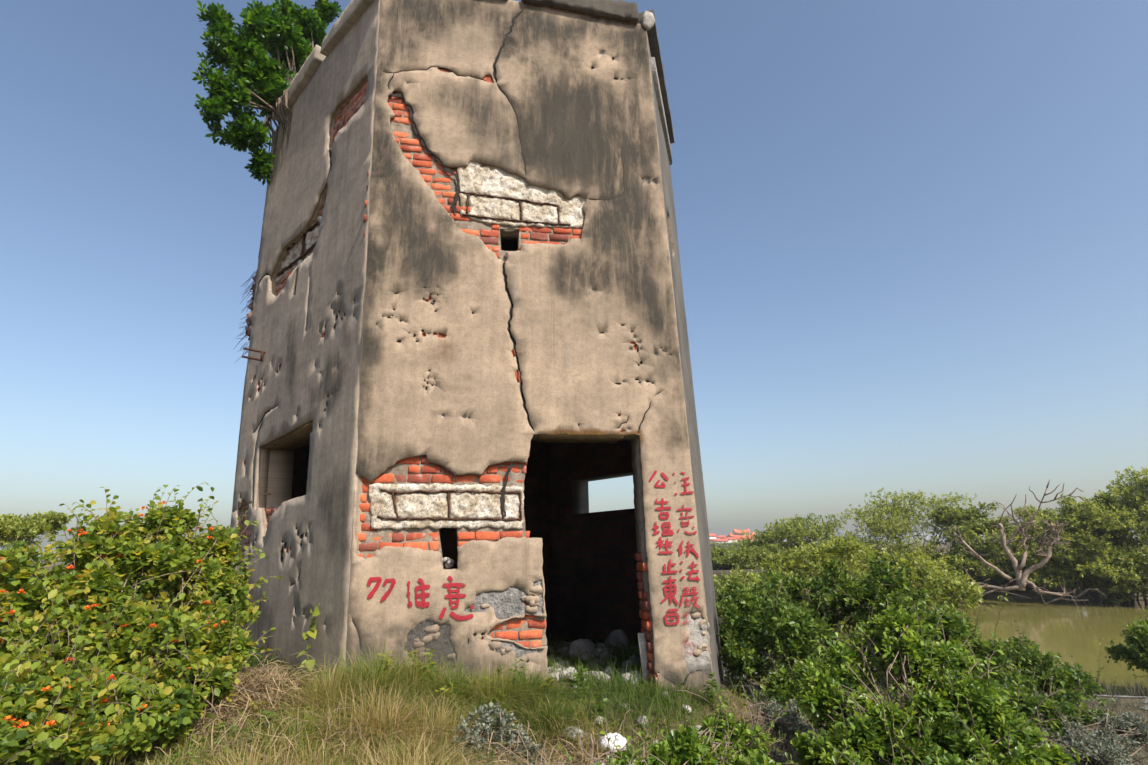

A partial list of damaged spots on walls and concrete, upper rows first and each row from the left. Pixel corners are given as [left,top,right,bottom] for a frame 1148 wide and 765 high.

spalling [275,203,325,296]
damp [367,135,457,288]
crack [385,10,526,175]
damp [442,93,499,137]
spalling [387,82,586,263]
damp [376,0,598,91]
damp [520,28,681,371]
crack [502,263,534,431]
spalling [357,455,530,564]
flaking render [404,620,457,671]
flaking render [464,580,547,663]
flaking render [635,553,702,734]